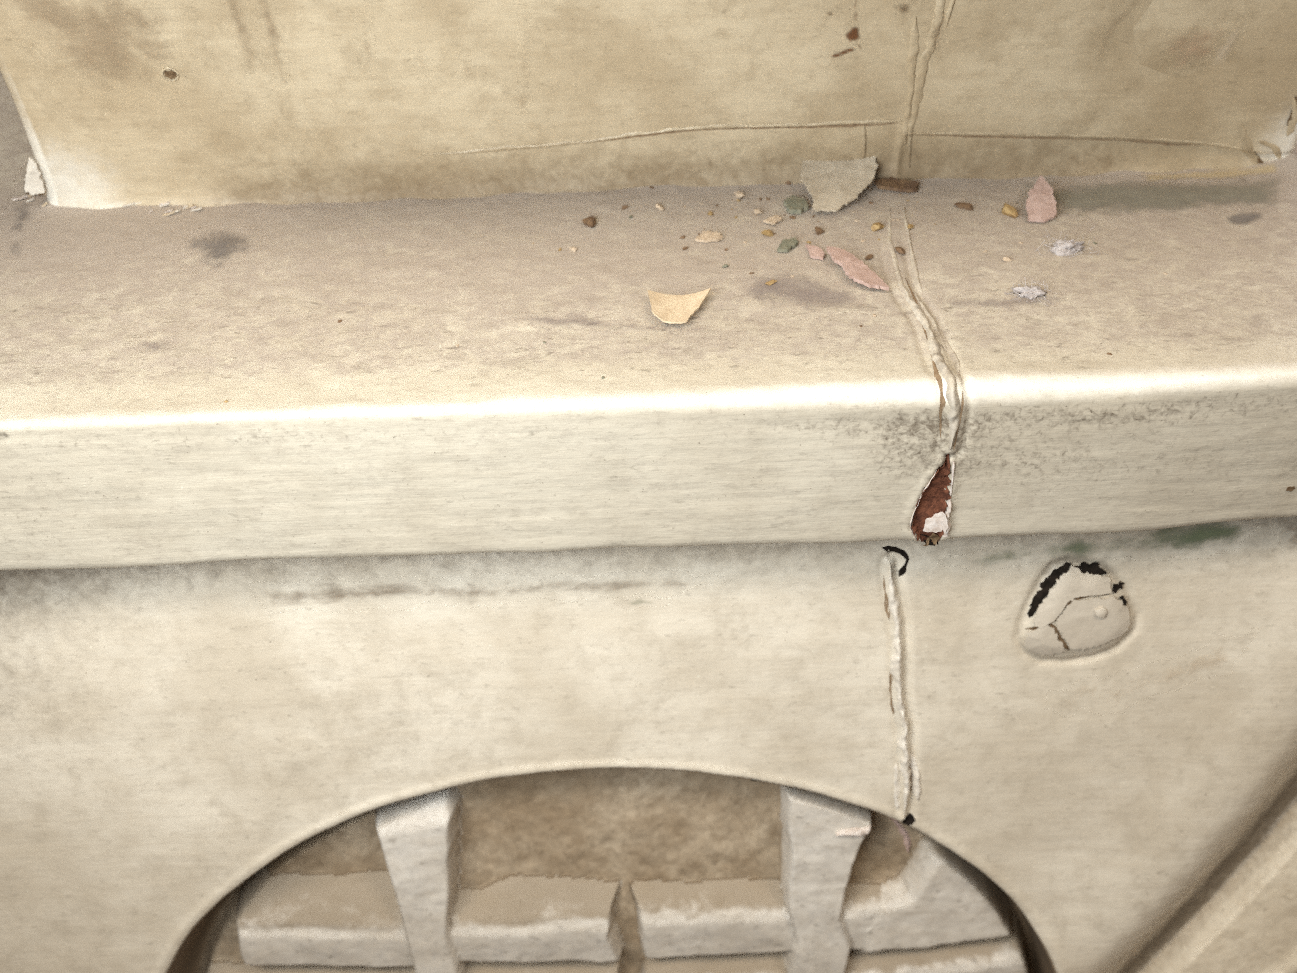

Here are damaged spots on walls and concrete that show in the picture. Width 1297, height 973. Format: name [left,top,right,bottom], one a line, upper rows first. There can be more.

crack [422,0,1264,168]
crack [887,207,964,450]
peeling [910,454,955,546]
crack [836,546,921,852]